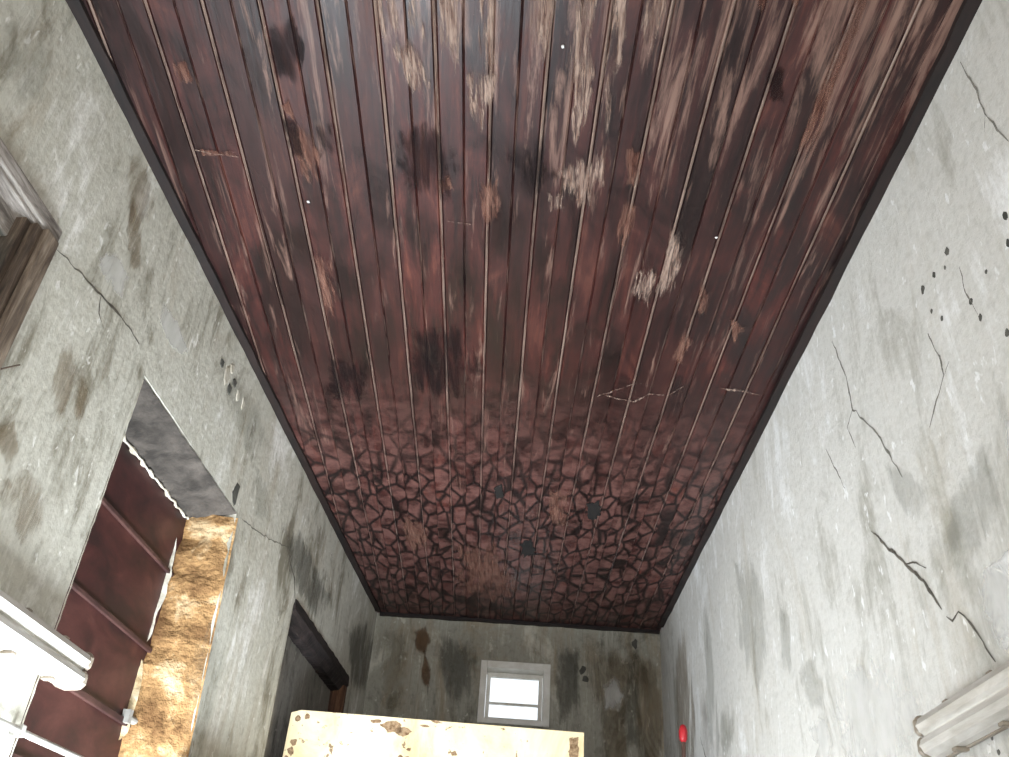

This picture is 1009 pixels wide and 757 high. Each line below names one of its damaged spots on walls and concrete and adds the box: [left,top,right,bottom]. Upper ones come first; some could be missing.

peeling [642,0,666,36]
peeling [393,40,430,90]
peeling [467,0,496,129]
peeling [570,0,597,145]
crack [960,62,1009,142]
peeling [316,259,334,311]
peeling [633,268,656,306]
crack [832,342,902,476]
crack [871,531,996,662]